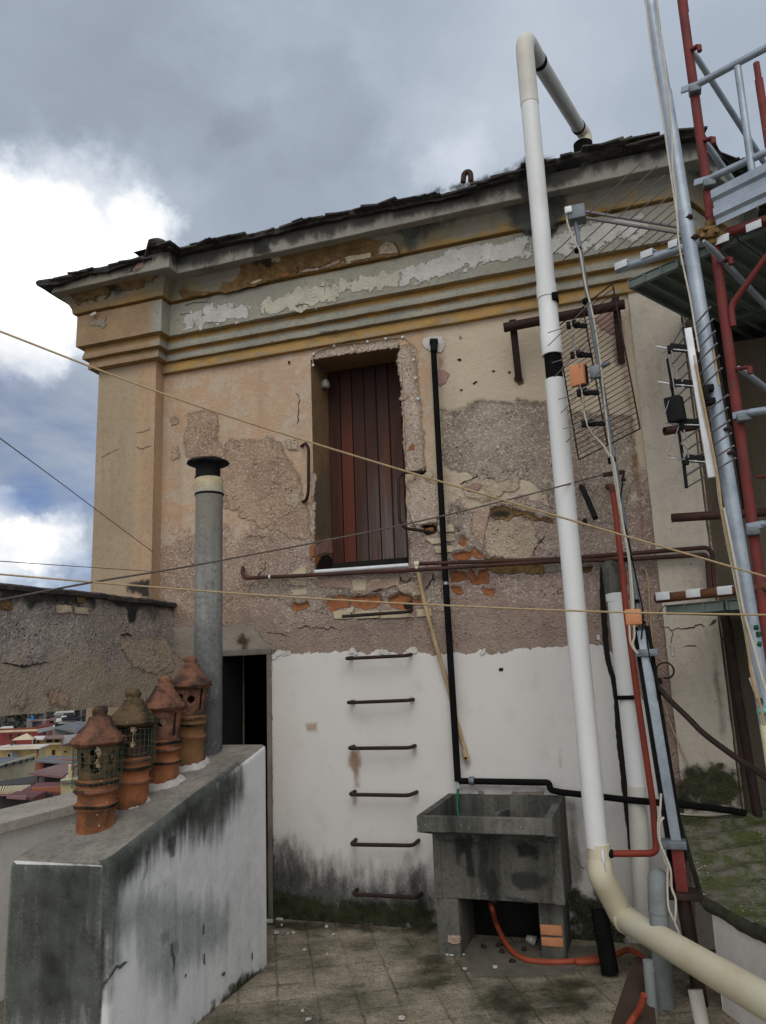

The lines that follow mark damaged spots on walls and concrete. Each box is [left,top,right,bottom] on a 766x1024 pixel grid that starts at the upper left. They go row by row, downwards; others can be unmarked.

peeling [182,234,533,331]
flaking render [170,340,557,614]
flaking render [568,410,637,524]
peeling [271,649,291,682]
leakage [44,776,238,1004]
leakage [266,845,437,930]
leakage [436,834,557,903]